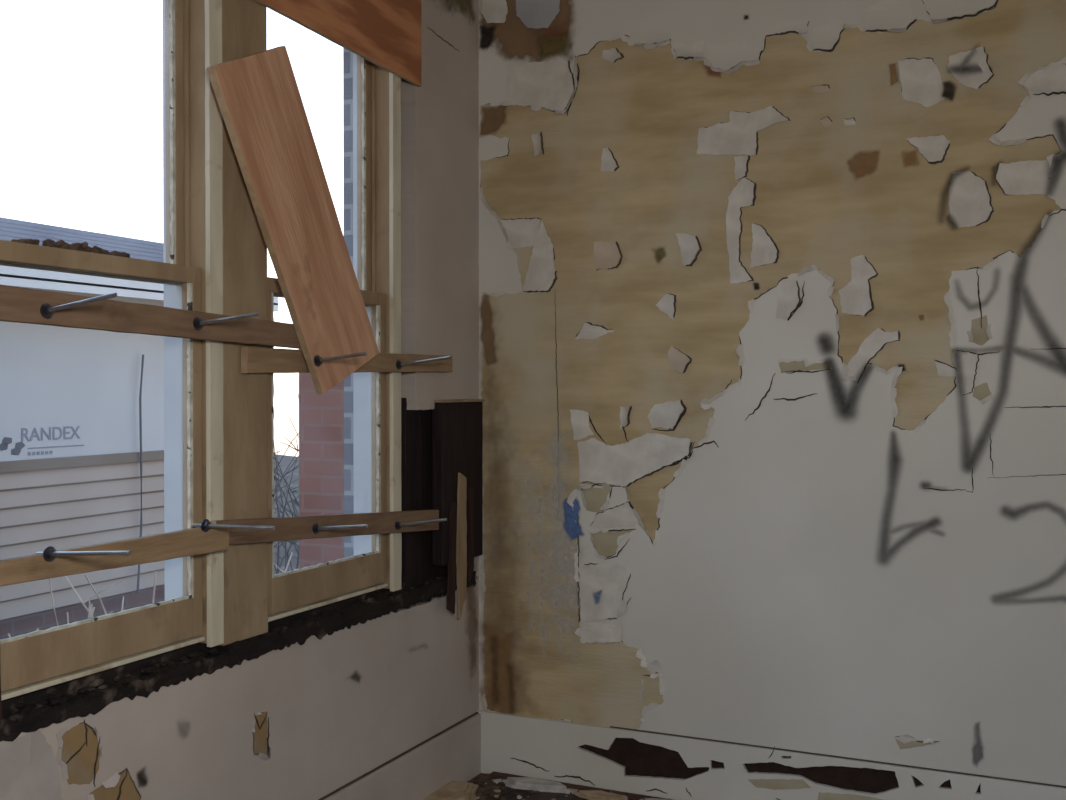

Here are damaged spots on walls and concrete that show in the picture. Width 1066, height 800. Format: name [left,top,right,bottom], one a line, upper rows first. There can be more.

peeling [479,0,1066,730]
peeling [0,722,141,800]
peeling [251,711,271,761]